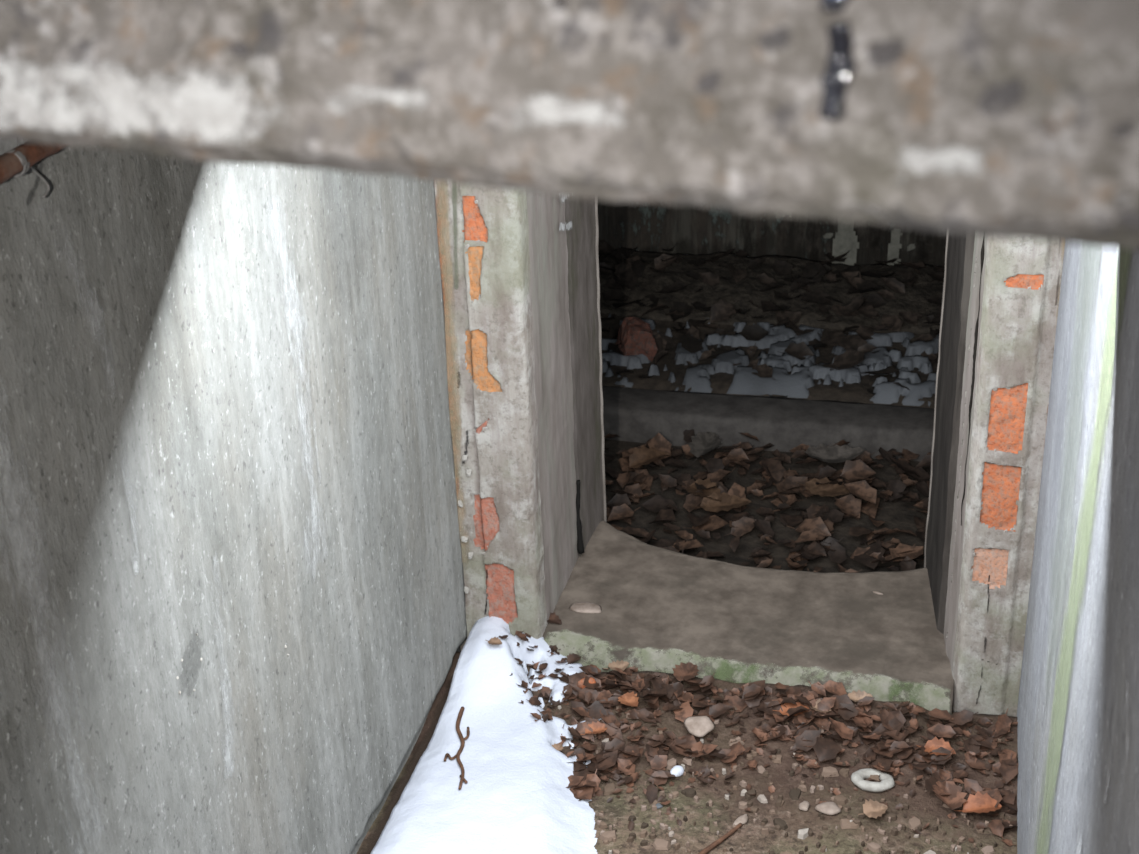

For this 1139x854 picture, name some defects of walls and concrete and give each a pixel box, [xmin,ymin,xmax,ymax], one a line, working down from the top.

corrosion [0,142,65,199]
peeling [822,221,859,266]
peeling [887,228,916,265]